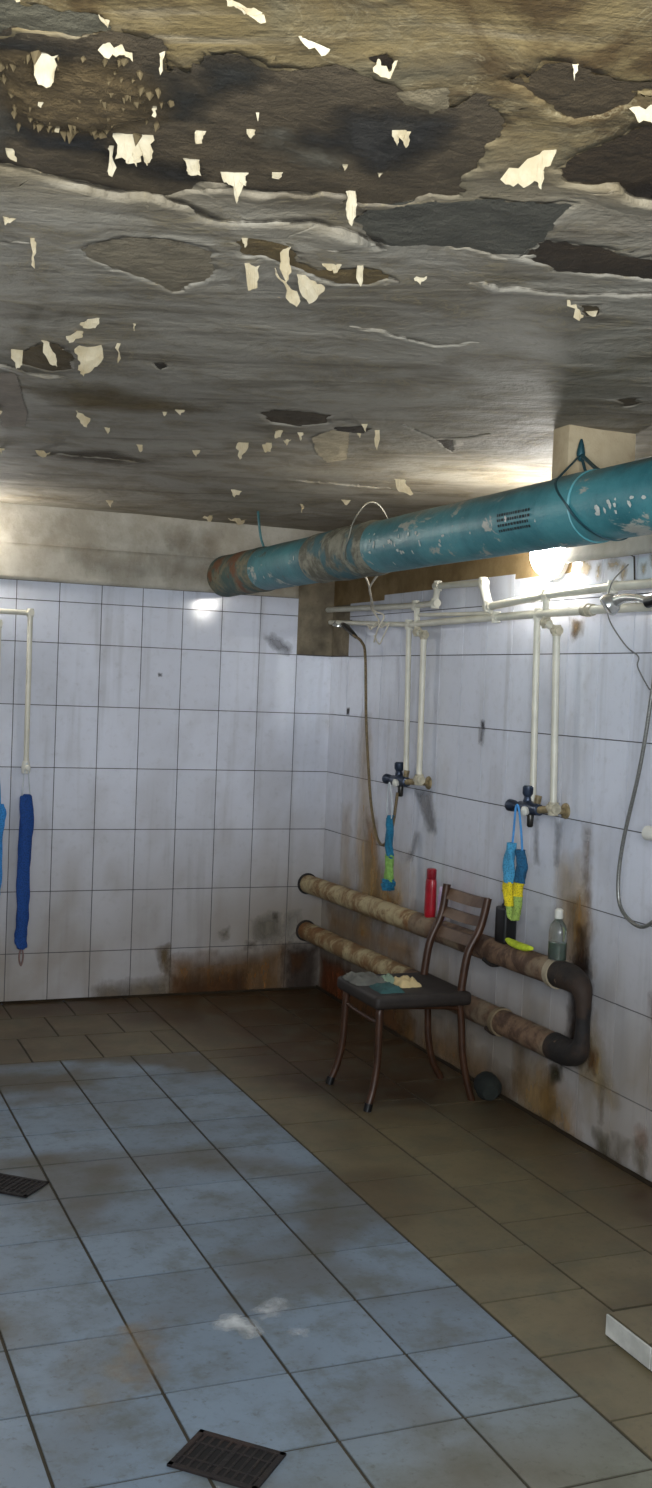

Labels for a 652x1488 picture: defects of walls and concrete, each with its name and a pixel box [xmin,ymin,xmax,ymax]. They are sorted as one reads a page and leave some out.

spalling [0,0,652,307]
spalling [567,300,612,321]
spalling [236,406,380,459]
peeling [395,479,413,495]
corrosion [98,947,481,1077]